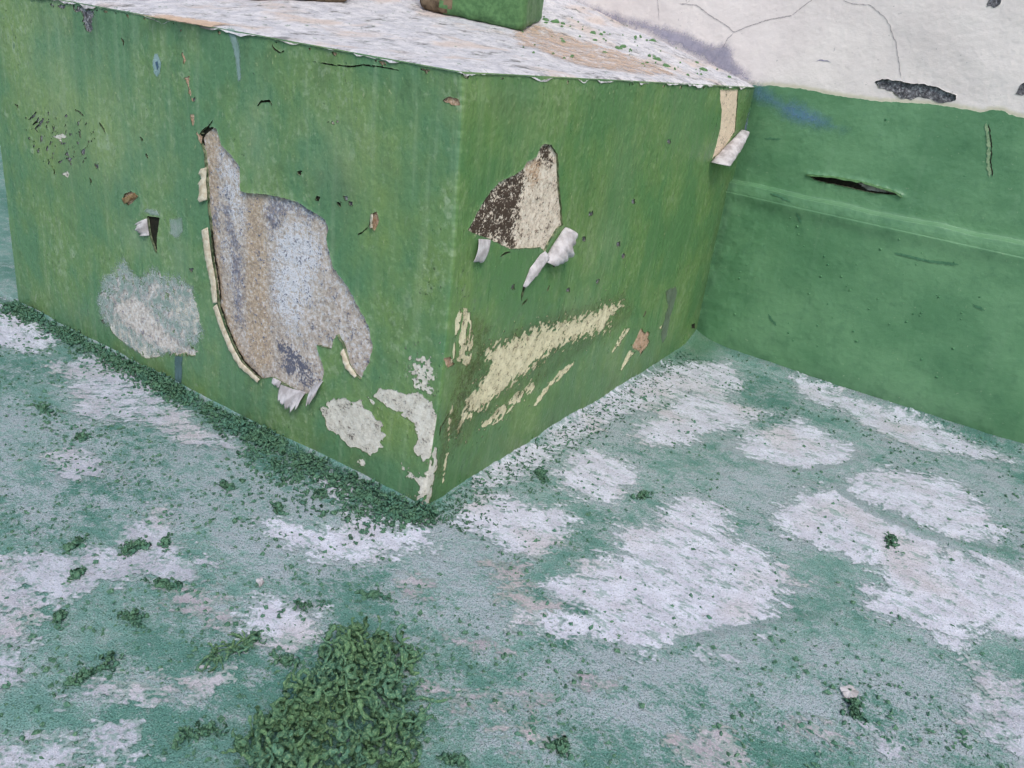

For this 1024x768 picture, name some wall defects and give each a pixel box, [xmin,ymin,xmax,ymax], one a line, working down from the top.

crack [657,0,812,46]
crack [845,1,901,75]
peeling [711,89,750,166]
flaking render [876,79,956,103]
peeling [134,216,160,250]
peeling [0,258,249,457]
peeling [191,114,1024,768]
peeling [0,501,341,768]